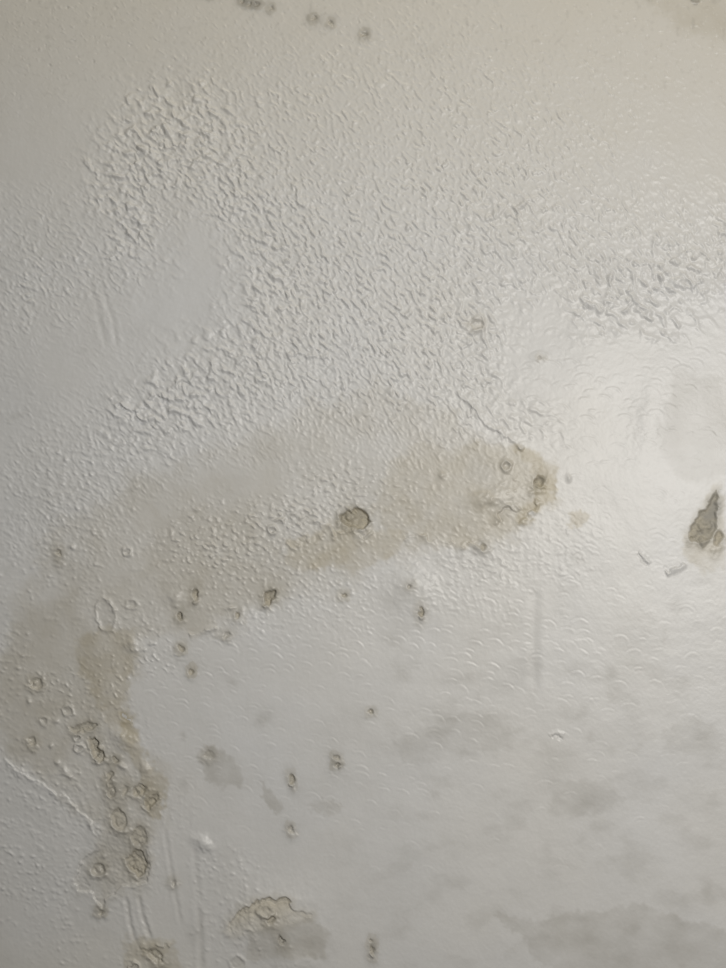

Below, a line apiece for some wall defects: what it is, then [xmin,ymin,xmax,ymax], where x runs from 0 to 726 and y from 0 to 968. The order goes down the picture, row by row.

peeling [310,504,383,548]
spalling [685,486,726,555]
damp [0,372,593,867]
spalling [66,718,110,765]
spalling [107,756,163,882]
spalling [222,892,318,939]
peeling [131,936,180,968]